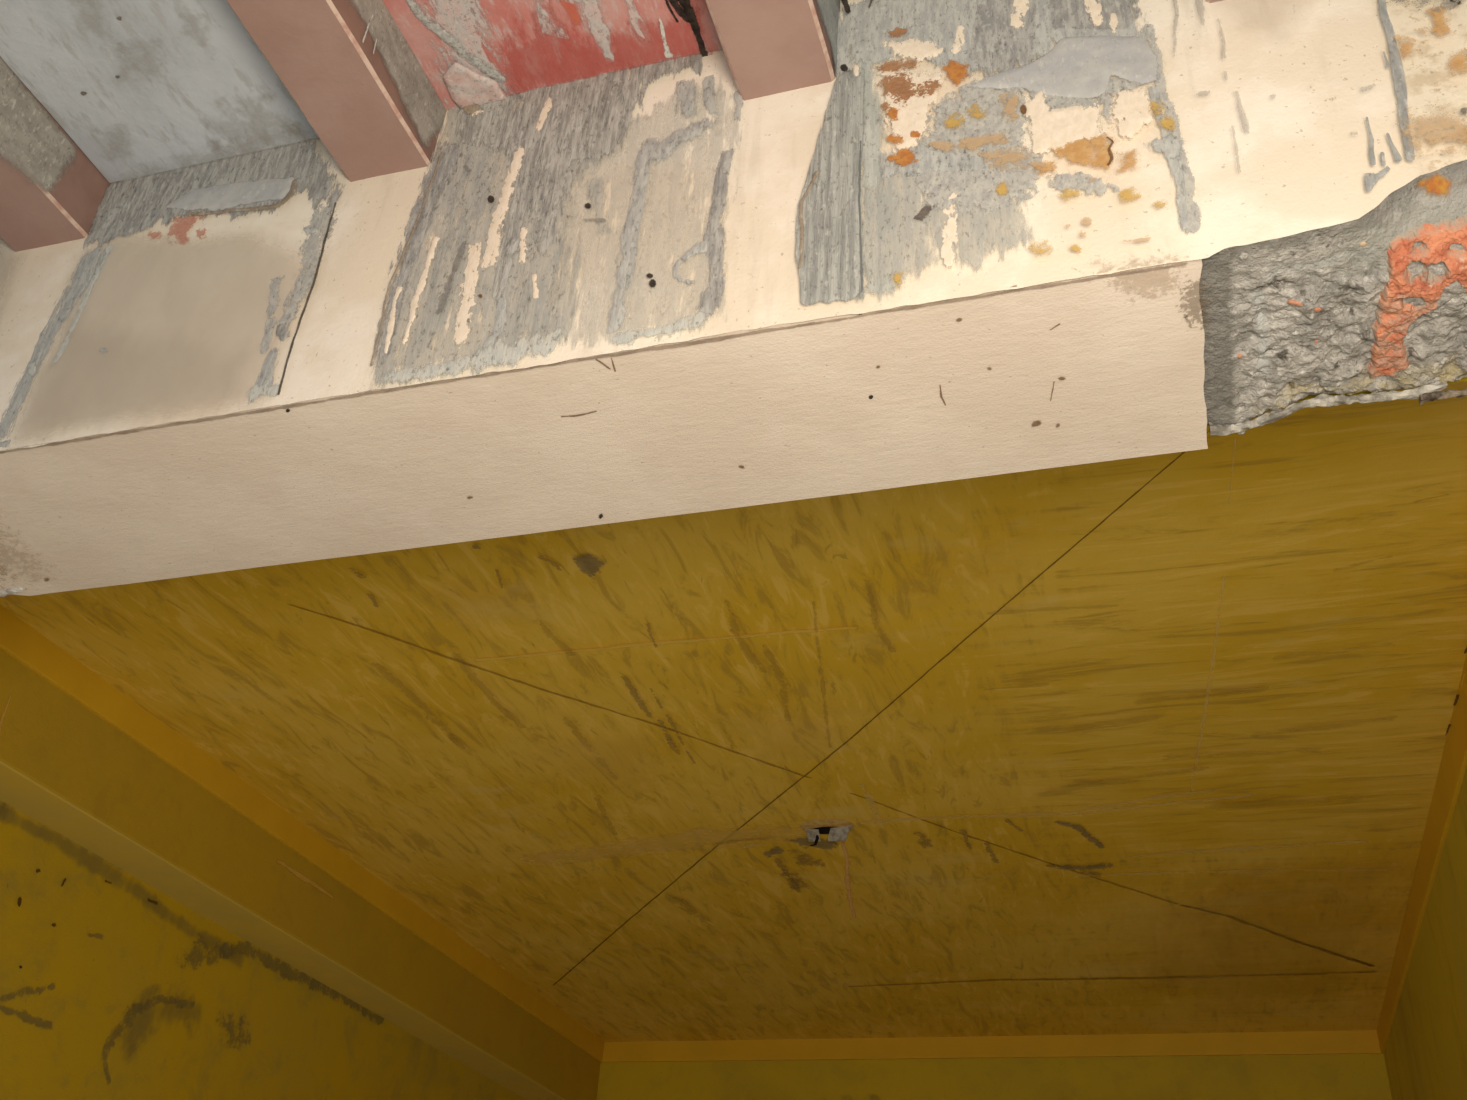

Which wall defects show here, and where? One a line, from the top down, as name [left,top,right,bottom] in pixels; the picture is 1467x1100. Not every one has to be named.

flaking render [406,0,513,109]
peeling [533,0,614,63]
peeling [626,0,674,59]
rust [885,27,907,37]
flaking render [84,139,345,247]
peeling [862,37,1153,289]
rust [876,59,1165,207]
rust [1066,217,1091,253]
rust [1150,101,1175,129]
spalling [1199,159,1467,436]
crack [291,451,1186,985]
crack [849,793,1375,987]